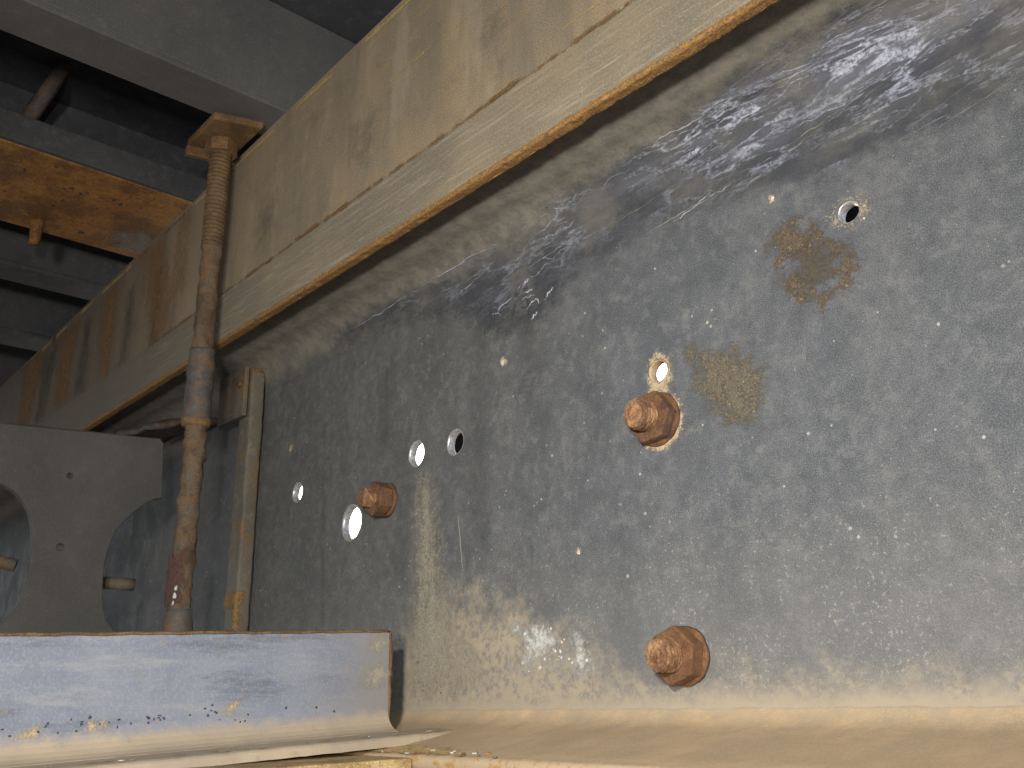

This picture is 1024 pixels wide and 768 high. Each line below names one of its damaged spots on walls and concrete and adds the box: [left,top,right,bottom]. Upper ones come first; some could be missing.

corrosion [214,0,780,351]
corrosion [763,190,870,313]
corrosion [79,361,188,431]
corrosion [684,342,769,425]
water stain [513,625,589,673]